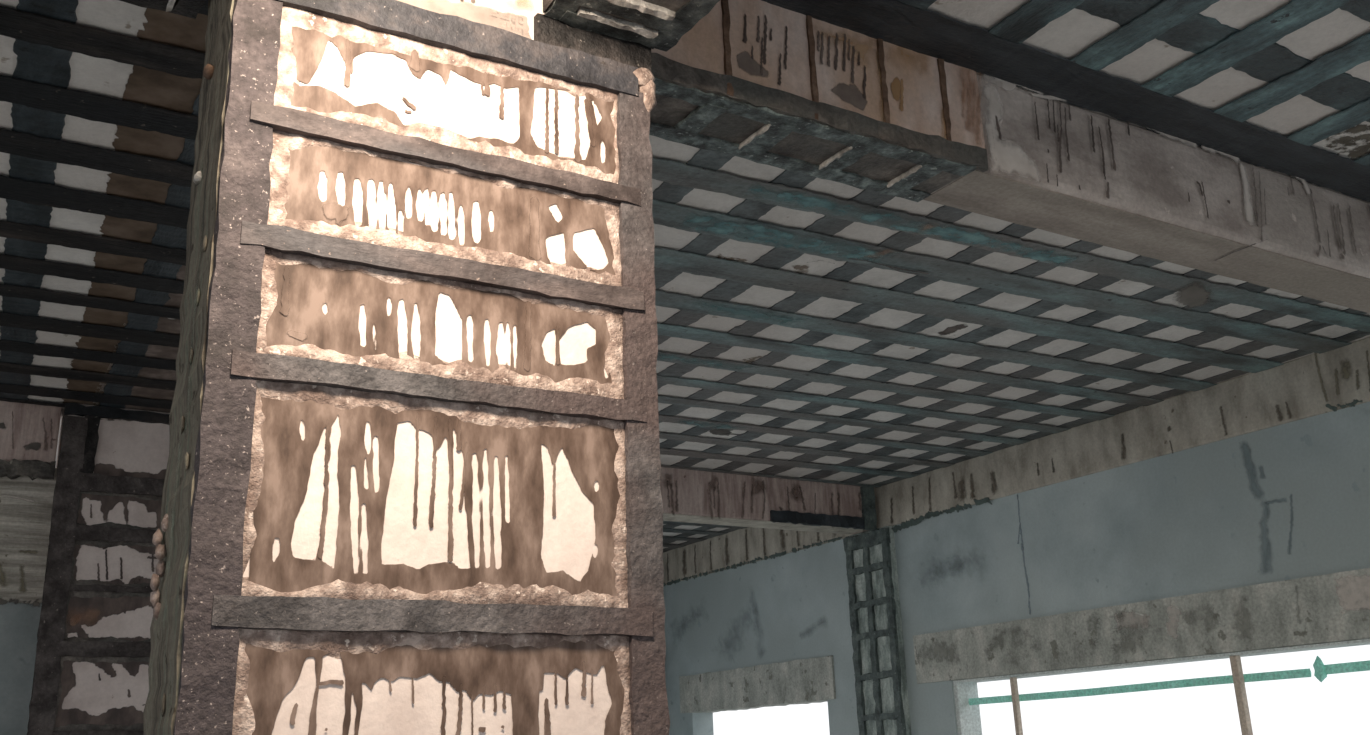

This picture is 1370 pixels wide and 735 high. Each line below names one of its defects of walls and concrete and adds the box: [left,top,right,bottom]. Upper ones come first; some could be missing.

spalling [761,0,1370,223]
spalling [652,149,1370,488]